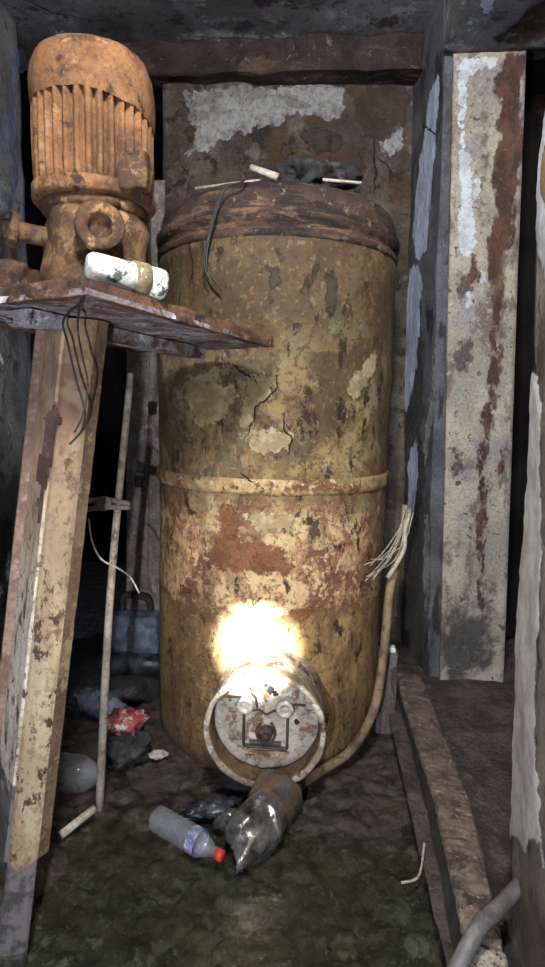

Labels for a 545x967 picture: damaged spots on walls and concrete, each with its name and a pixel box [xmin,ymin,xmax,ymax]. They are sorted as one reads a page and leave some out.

peeling [455,56,498,257]
peeling [535,115,545,279]
corrosion [467,52,526,611]